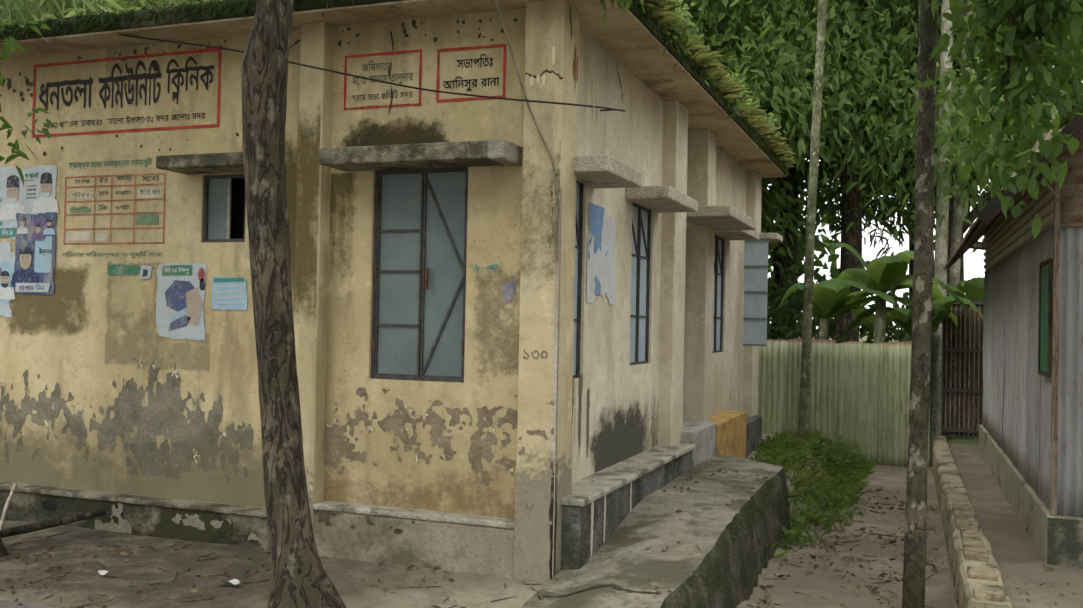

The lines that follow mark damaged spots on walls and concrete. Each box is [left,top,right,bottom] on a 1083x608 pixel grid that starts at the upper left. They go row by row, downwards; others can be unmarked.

damp [343,20,448,147]
crack [525,69,563,79]
damp [9,268,86,335]
peeling [325,183,563,578]
peeling [0,357,254,476]
spalling [95,503,132,534]
spalling [172,513,232,530]
spalling [248,533,268,549]